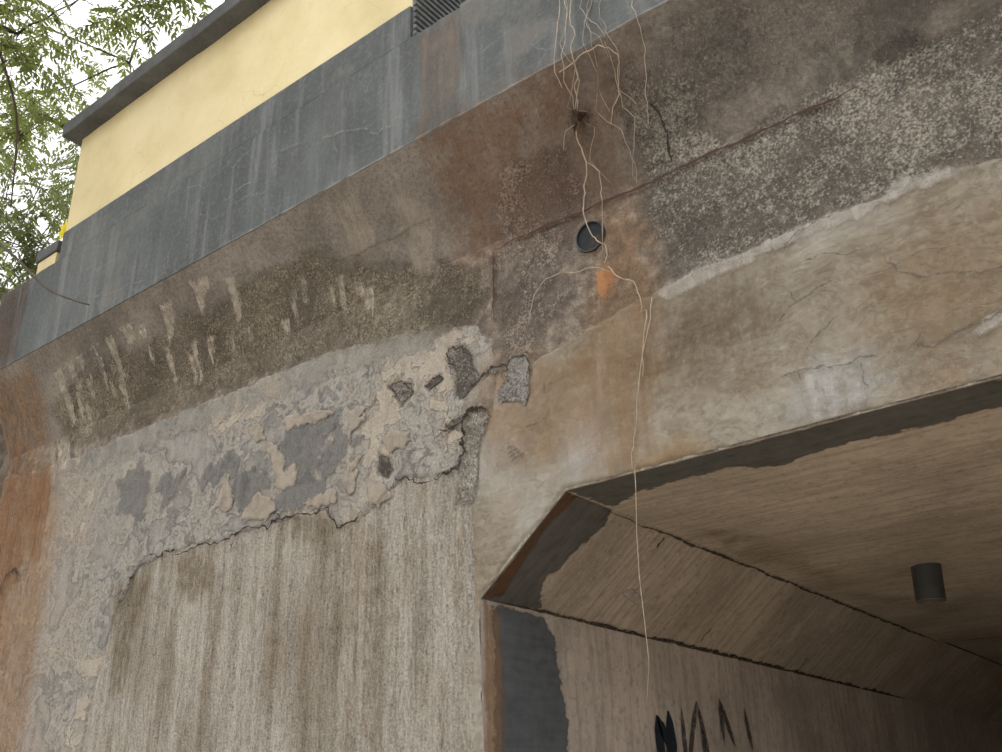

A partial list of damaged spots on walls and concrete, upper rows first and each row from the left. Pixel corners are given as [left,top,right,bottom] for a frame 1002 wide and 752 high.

crack [492,84,862,320]
leakage [14,195,487,485]
spalling [386,380,414,405]
spalling [424,345,480,399]
crack [476,364,506,382]
flaking render [116,463,185,525]
flaking render [199,396,410,524]
crack [392,406,486,486]
spalling [440,409,489,505]
crack [116,506,369,609]
crack [602,508,1002,644]
crack [498,601,906,699]